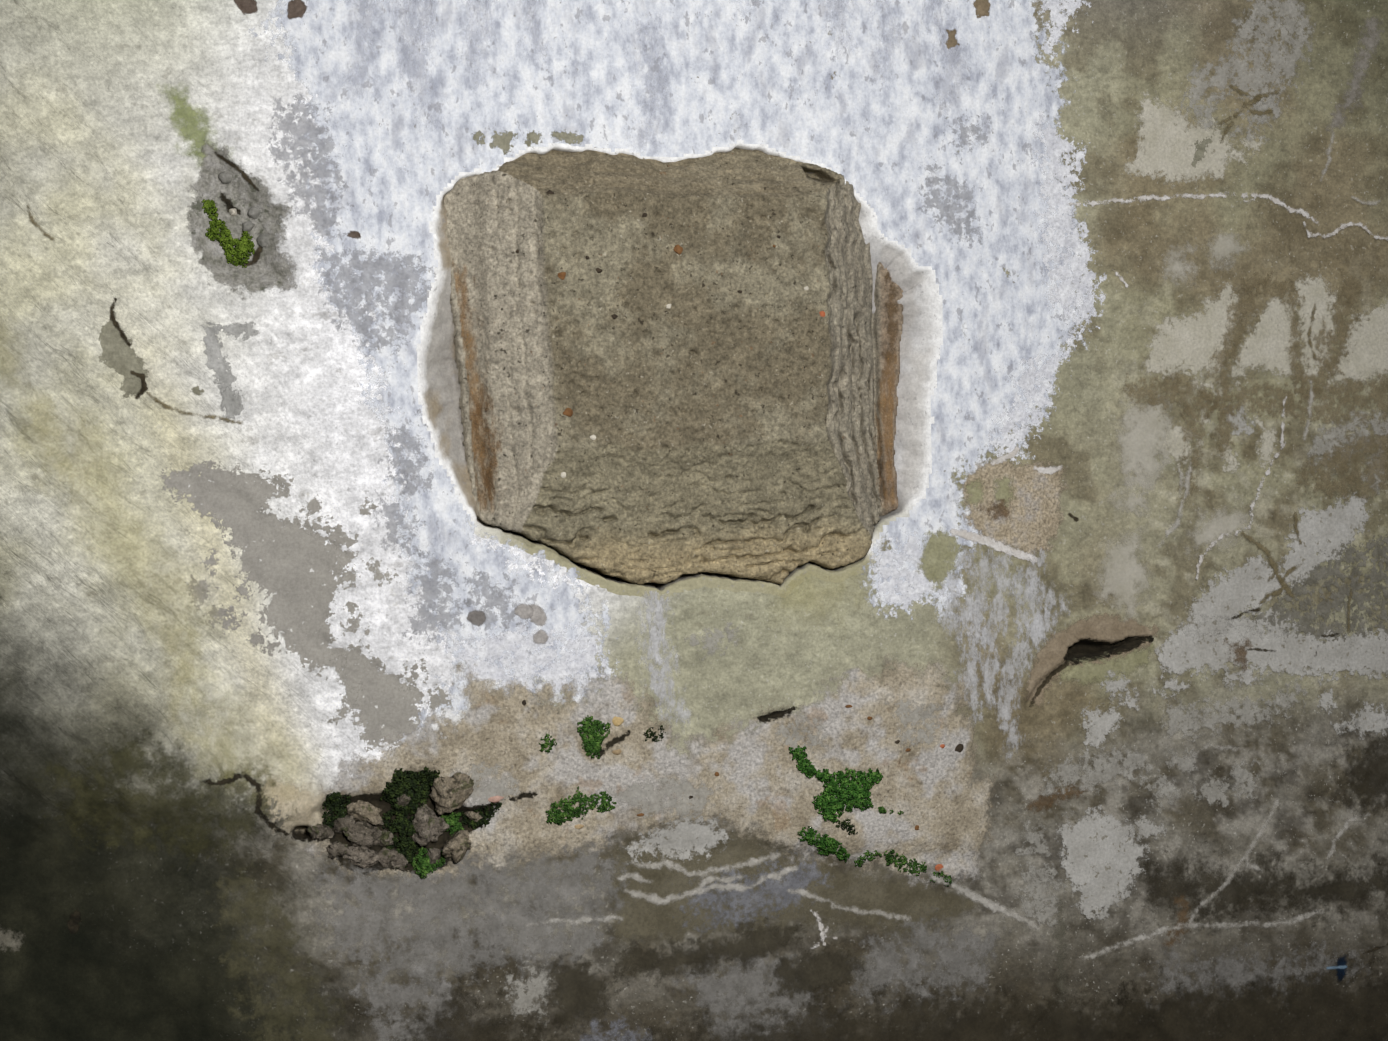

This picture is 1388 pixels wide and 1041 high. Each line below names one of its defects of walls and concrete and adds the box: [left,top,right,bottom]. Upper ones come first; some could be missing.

crack [1069,192,1388,240]
damp [249,0,1107,757]
peeling [159,94,994,884]
crack [204,773,289,836]
crack [551,854,908,949]
damp [316,827,1388,1041]
crack [932,876,1037,928]